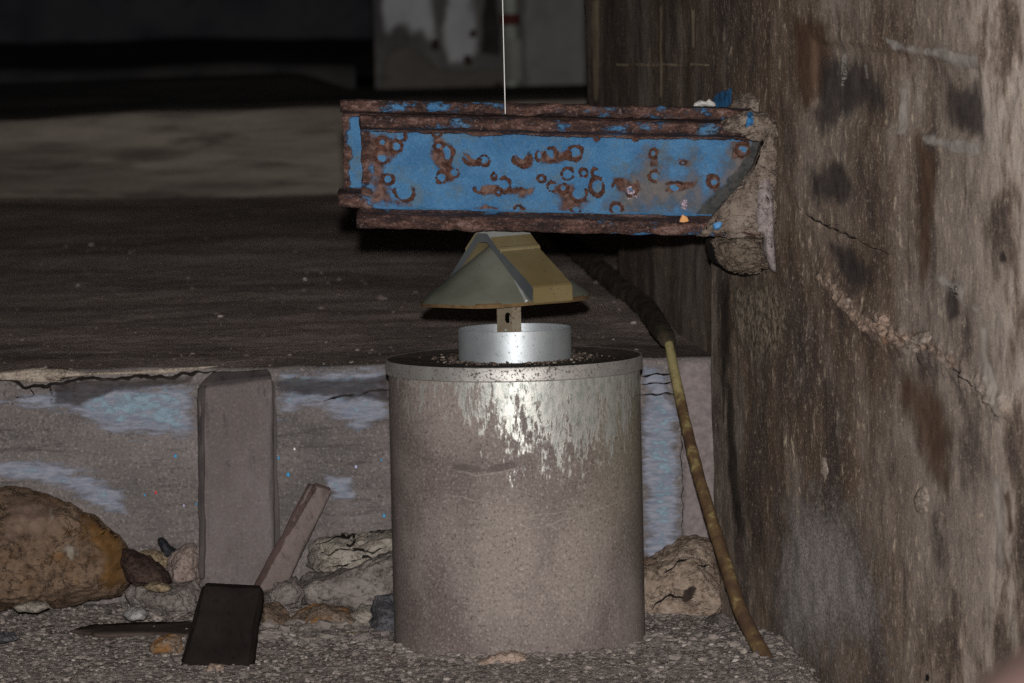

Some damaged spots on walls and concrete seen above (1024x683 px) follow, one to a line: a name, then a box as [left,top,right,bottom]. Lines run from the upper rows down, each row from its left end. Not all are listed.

leakage [817,53,884,130]
leakage [922,87,984,156]
rust [369,133,416,206]
rust [431,132,720,213]
leakage [811,164,850,201]
crack [795,196,889,254]
spalling [815,276,958,368]
crack [0,369,219,404]